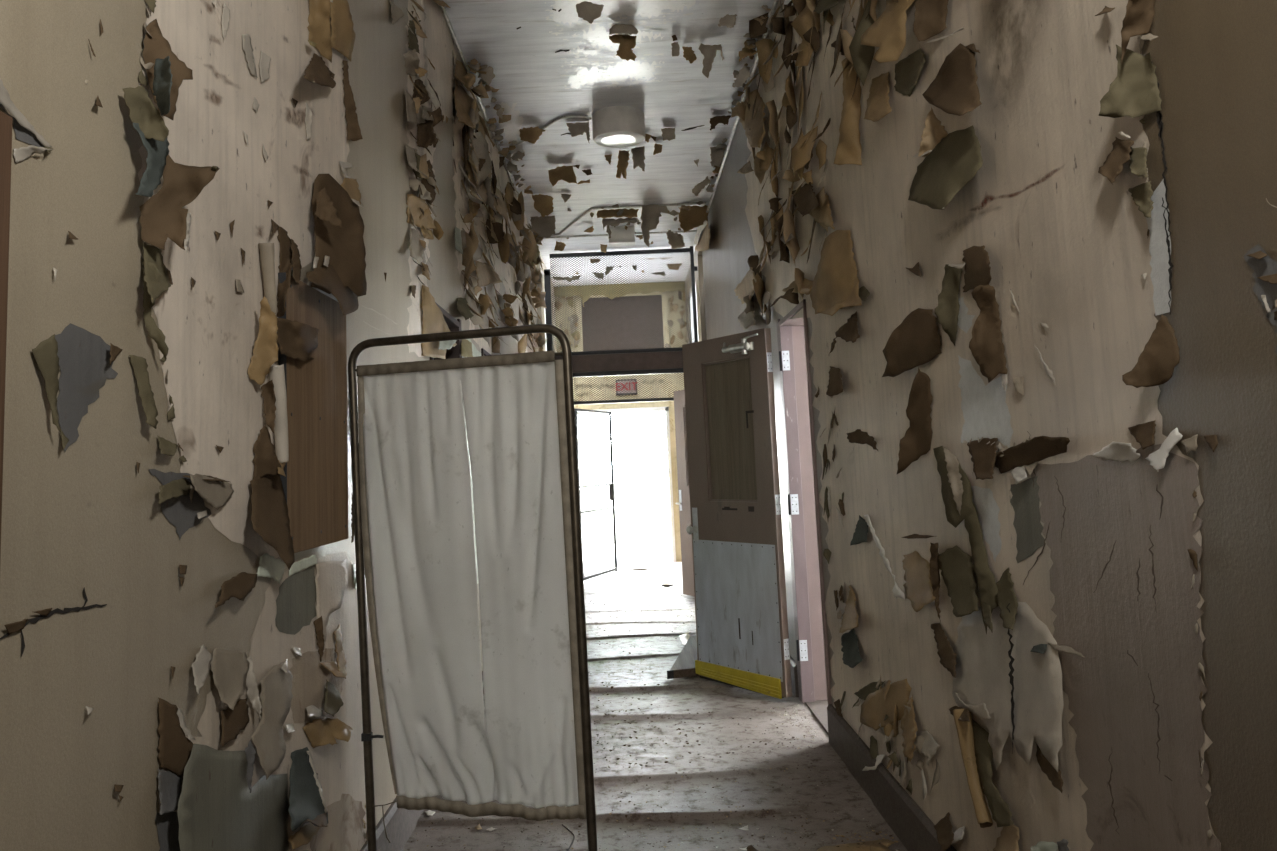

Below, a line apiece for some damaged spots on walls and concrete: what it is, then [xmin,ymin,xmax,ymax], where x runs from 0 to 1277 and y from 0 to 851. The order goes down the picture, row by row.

crack [0,587,107,657]
peeling [32,0,367,851]
peeling [403,0,1221,851]
peeling [1243,244,1277,354]